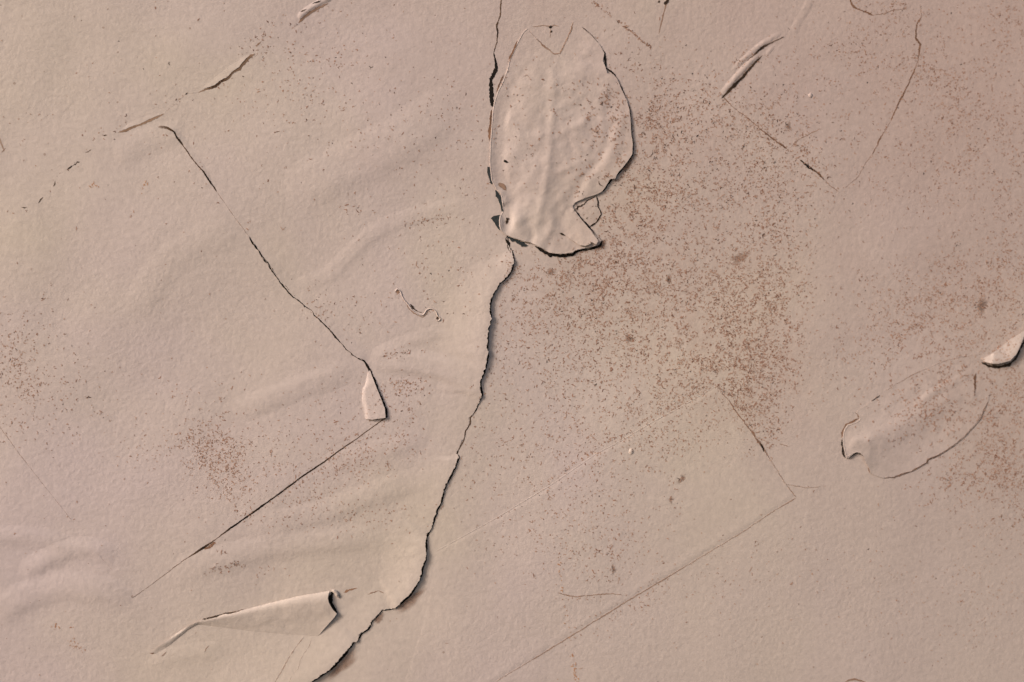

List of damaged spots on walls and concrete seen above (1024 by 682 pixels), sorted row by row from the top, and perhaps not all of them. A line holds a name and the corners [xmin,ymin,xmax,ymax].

crack [489,0,502,107]
peeling [487,21,634,257]
crack [723,0,922,190]
crack [22,22,388,597]
crack [201,236,515,682]
peeling [841,331,1024,478]